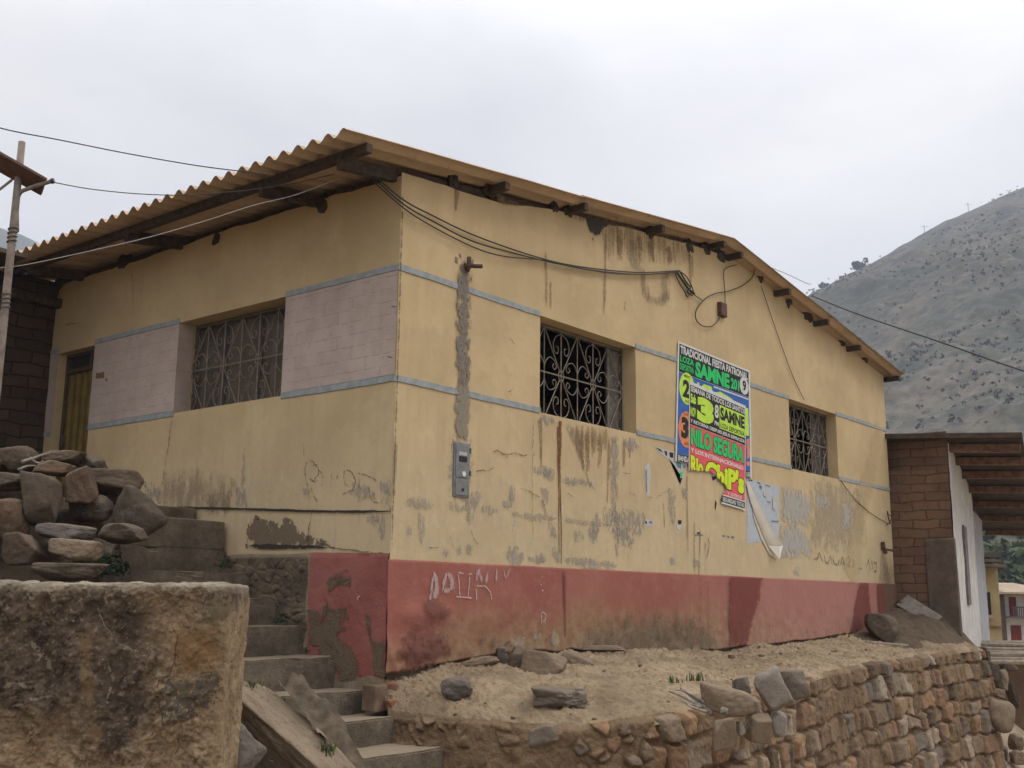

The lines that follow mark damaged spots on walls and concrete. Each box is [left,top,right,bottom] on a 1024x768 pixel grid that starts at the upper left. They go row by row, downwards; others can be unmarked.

peeling [506,437,646,569]
peeling [778,485,829,576]
spalling [223,515,361,681]